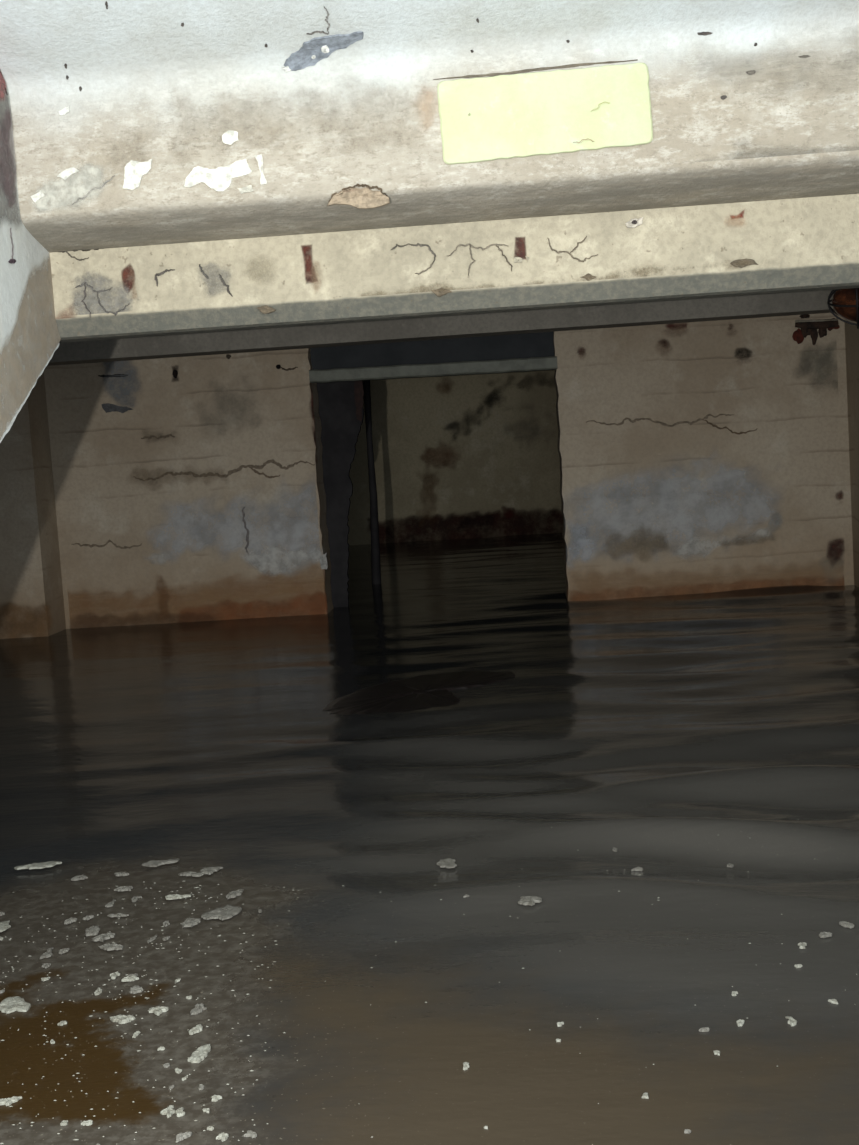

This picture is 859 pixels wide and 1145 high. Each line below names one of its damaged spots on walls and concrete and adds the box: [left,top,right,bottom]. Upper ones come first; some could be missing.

peeling [282,7,364,72]
peeling [0,71,21,224]
peeling [222,130,239,145]
peeling [31,159,153,211]
peeling [183,154,267,194]
rust [122,265,134,292]
rust [302,246,317,282]
crack [391,243,513,276]
crack [548,236,598,262]
crack [141,433,175,441]
crack [586,414,757,435]
crack [133,459,315,481]